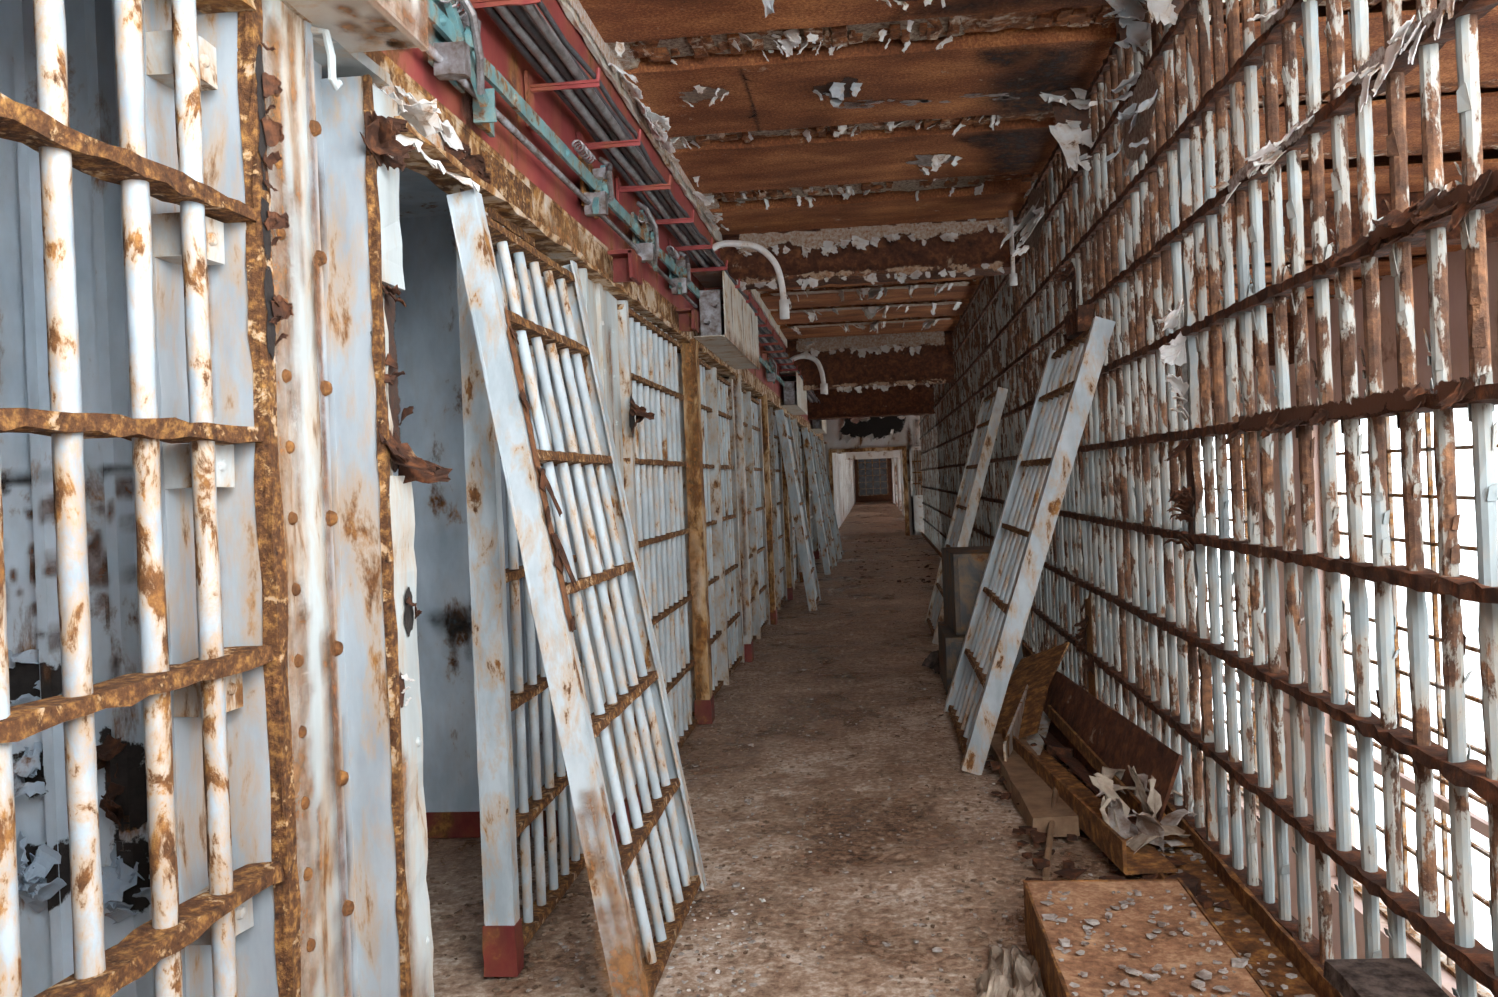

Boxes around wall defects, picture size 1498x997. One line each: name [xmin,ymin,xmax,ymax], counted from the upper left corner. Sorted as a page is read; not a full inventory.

rust [264,13,323,498]
peeling [360,80,491,193]
peeling [566,0,1045,358]
peeling [1039,0,1184,177]
peeling [8,649,62,706]
rust [285,543,340,791]
peeling [12,741,48,798]
peeling [16,830,71,913]
peeling [96,727,151,924]
rust [292,724,349,997]
rust [581,788,611,827]
rust [600,904,650,997]